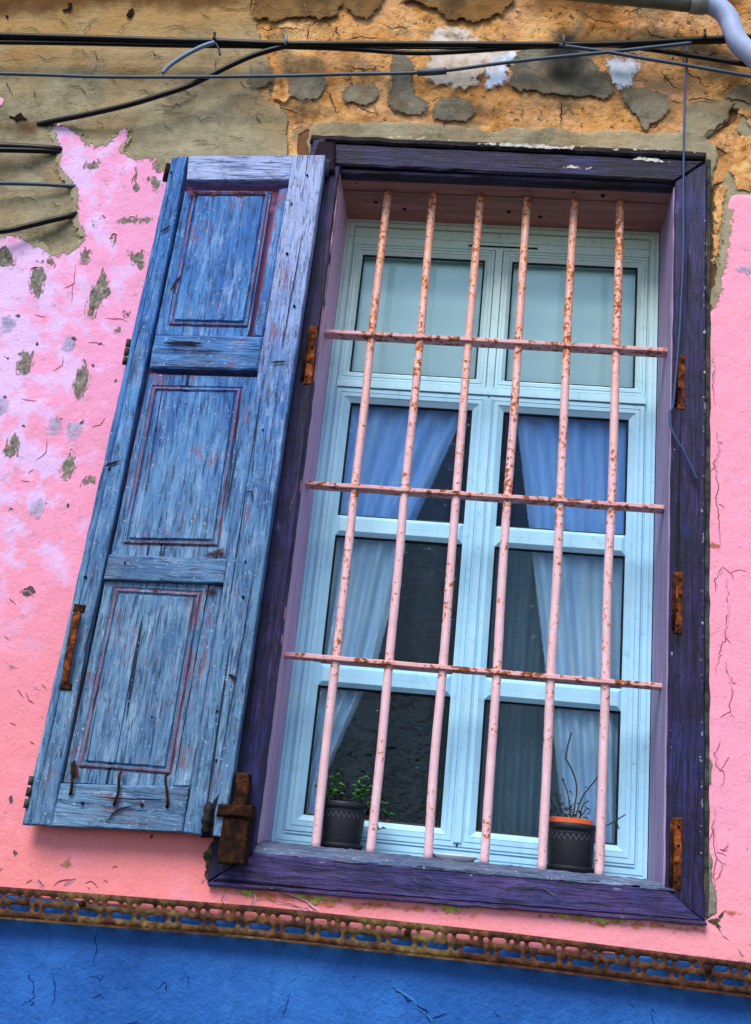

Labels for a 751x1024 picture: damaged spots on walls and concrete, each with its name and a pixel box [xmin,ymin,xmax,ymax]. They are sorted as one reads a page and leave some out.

spalling [247,0,751,309]
peeling [0,122,166,298]
peeling [83,268,111,319]
peeling [4,342,38,375]
peeling [71,358,94,400]
peeling [2,425,25,459]
peeling [59,447,96,487]
crack [709,432,747,891]